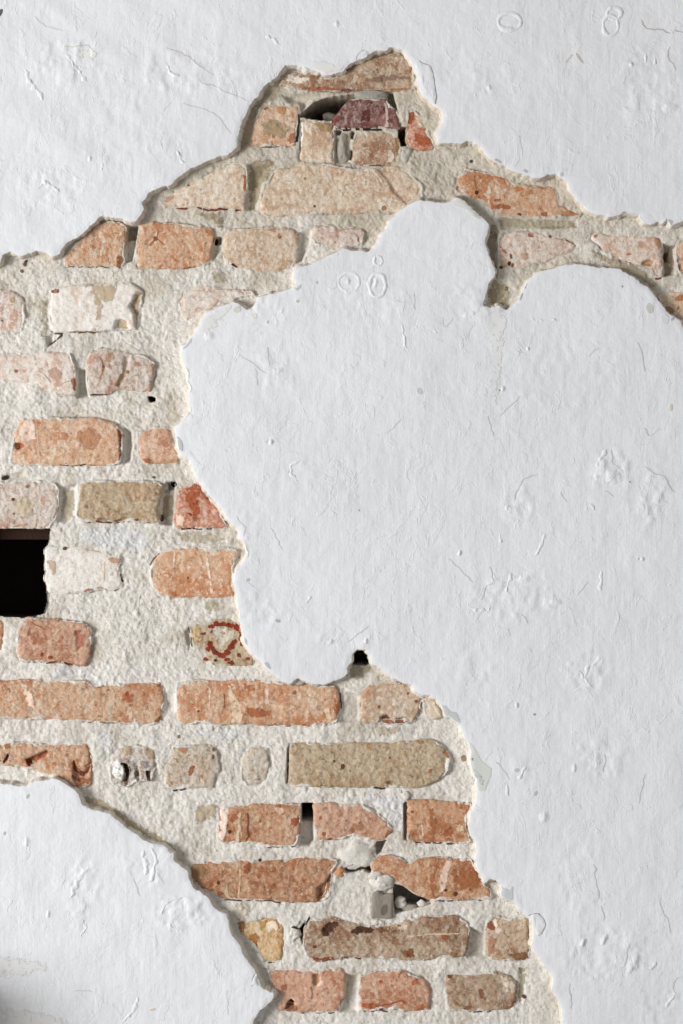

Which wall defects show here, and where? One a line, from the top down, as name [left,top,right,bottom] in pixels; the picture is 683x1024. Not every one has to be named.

peeling [451,199,481,219]
spalling [117,291,142,329]
spalling [0,498,50,617]
spalling [378,692,420,723]
spalling [122,746,154,759]
peeling [461,742,491,791]
spalling [316,875,331,899]